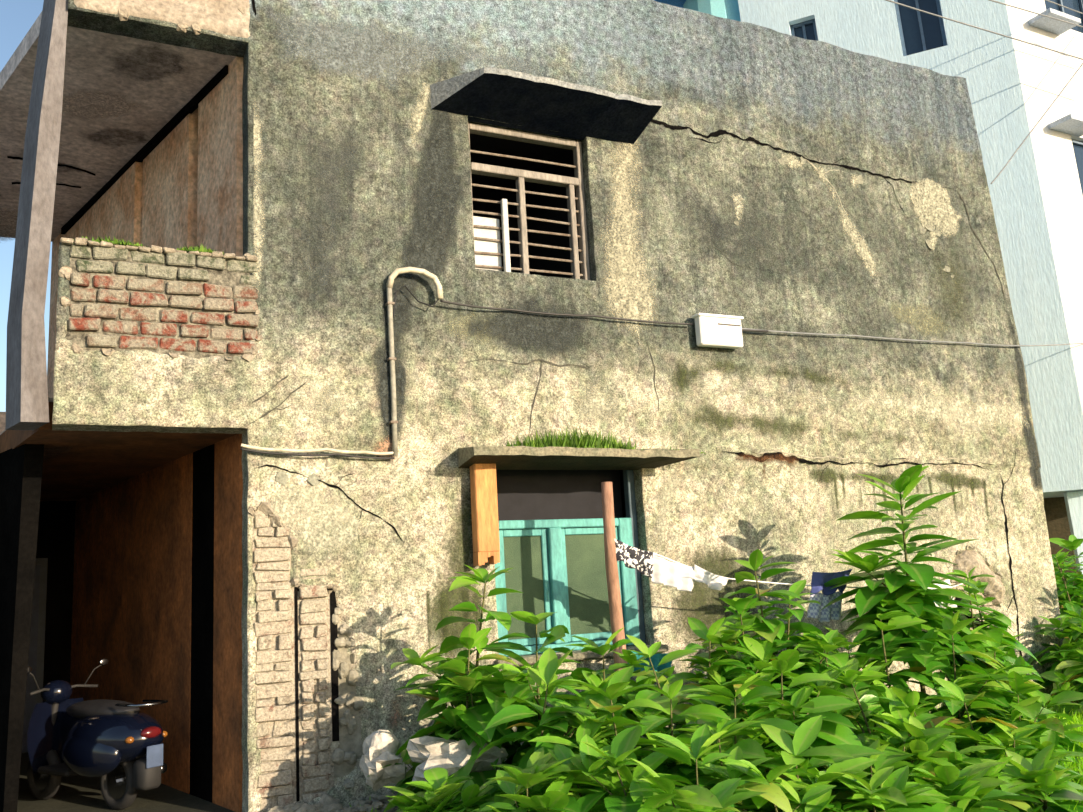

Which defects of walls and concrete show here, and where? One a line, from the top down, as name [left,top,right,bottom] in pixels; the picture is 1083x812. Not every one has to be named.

spalling [0,210,18,240]
crack [7,156,23,185]
crack [56,164,96,188]
crack [651,119,1006,299]
peeling [910,179,961,250]
spalling [59,237,263,361]
crack [254,464,402,544]
crack [717,446,1022,656]
spalling [950,545,1006,630]
spalling [247,471,371,812]